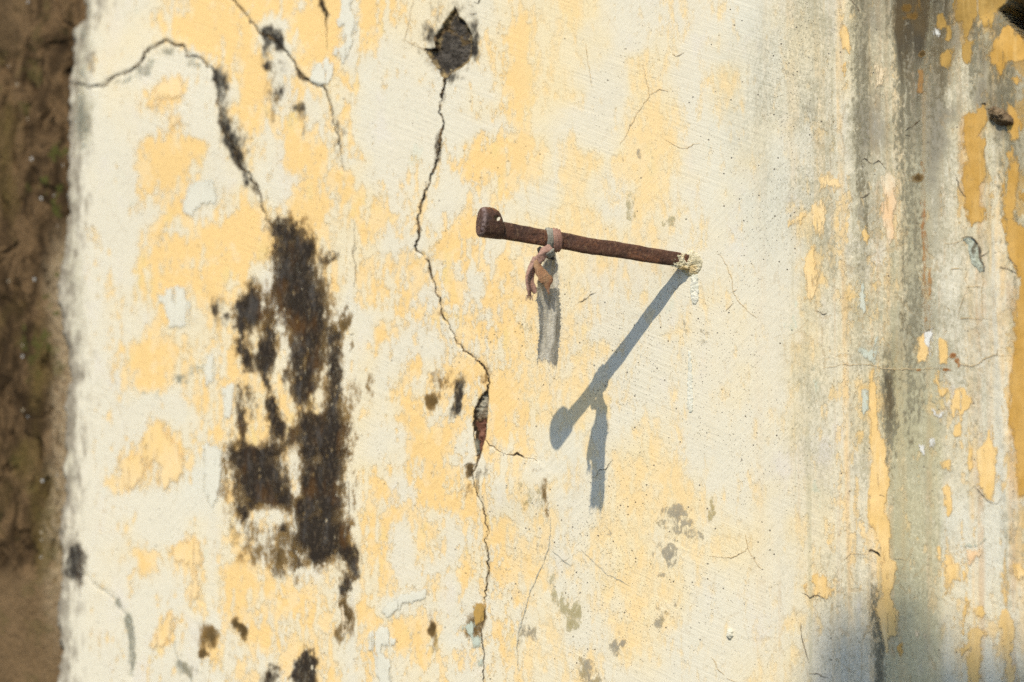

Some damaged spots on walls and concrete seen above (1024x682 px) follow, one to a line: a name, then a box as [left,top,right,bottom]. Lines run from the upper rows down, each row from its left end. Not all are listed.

crack [69,39,273,227]
crack [234,0,343,165]
spalling [424,0,480,82]
peeling [933,0,1024,85]
crack [413,78,490,392]
leakage [881,0,954,471]
peeling [1000,102,1024,497]
leakage [210,212,373,643]
spalling [472,391,489,464]
leakage [64,544,86,584]
crack [465,439,628,682]
leakage [869,578,886,682]